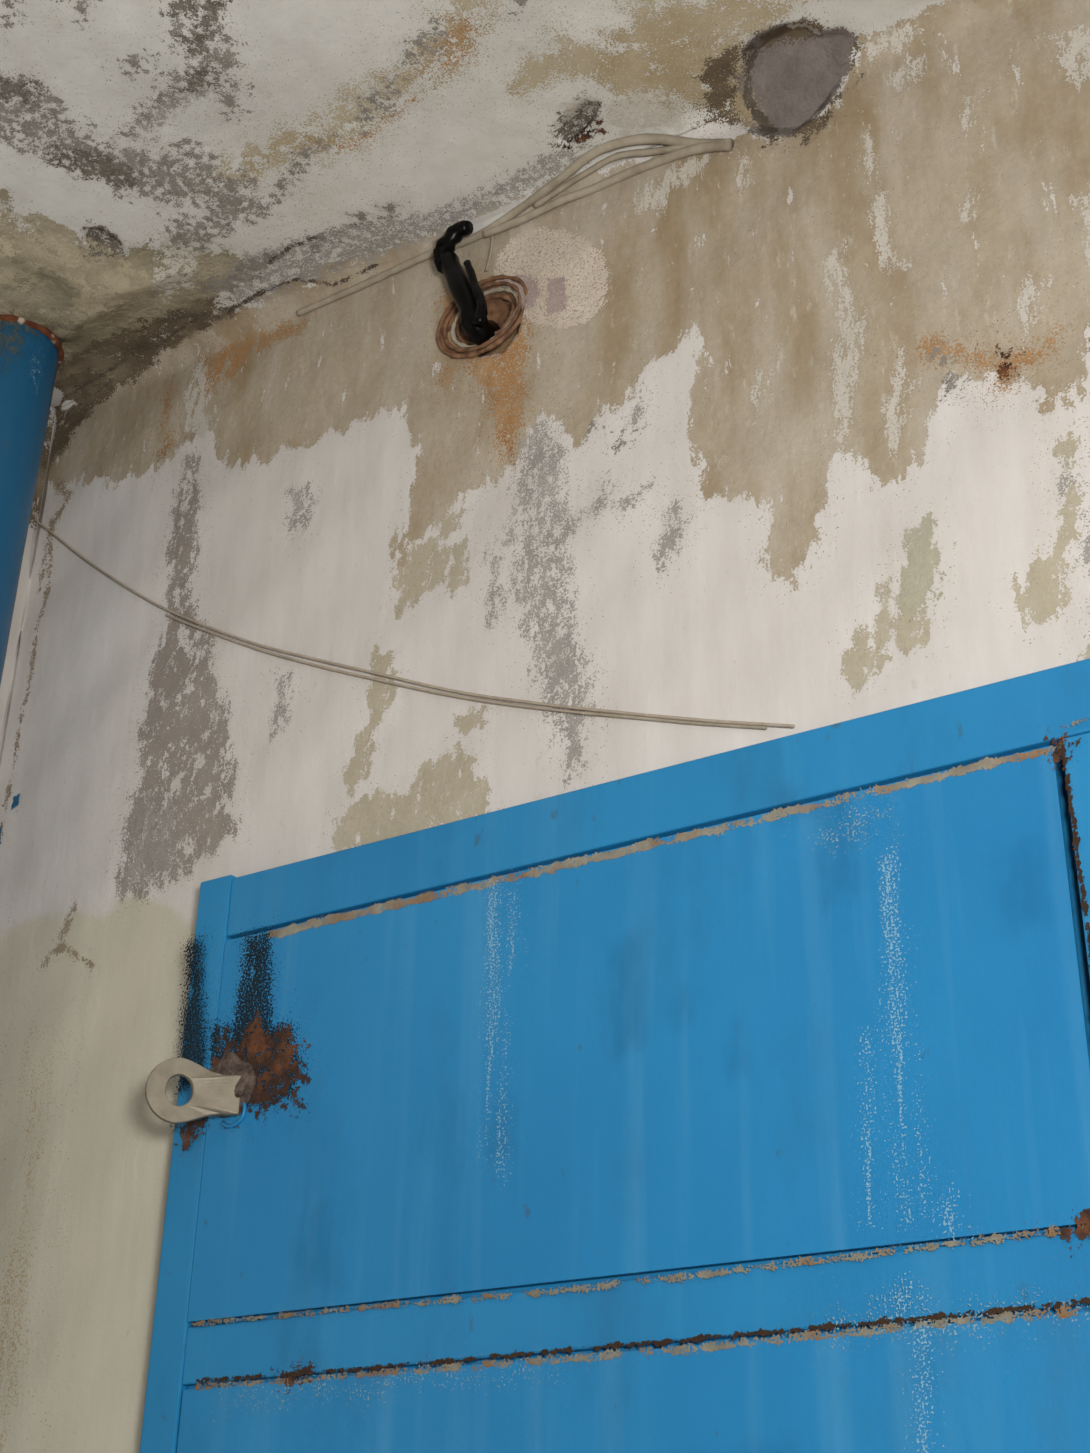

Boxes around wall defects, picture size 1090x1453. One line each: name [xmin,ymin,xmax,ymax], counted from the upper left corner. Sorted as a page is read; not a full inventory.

water stain [0,0,825,309]
rust [422,277,551,484]
peeling [48,0,1090,633]
rust [893,305,1083,421]
peeling [840,511,958,696]
peeling [331,642,492,852]